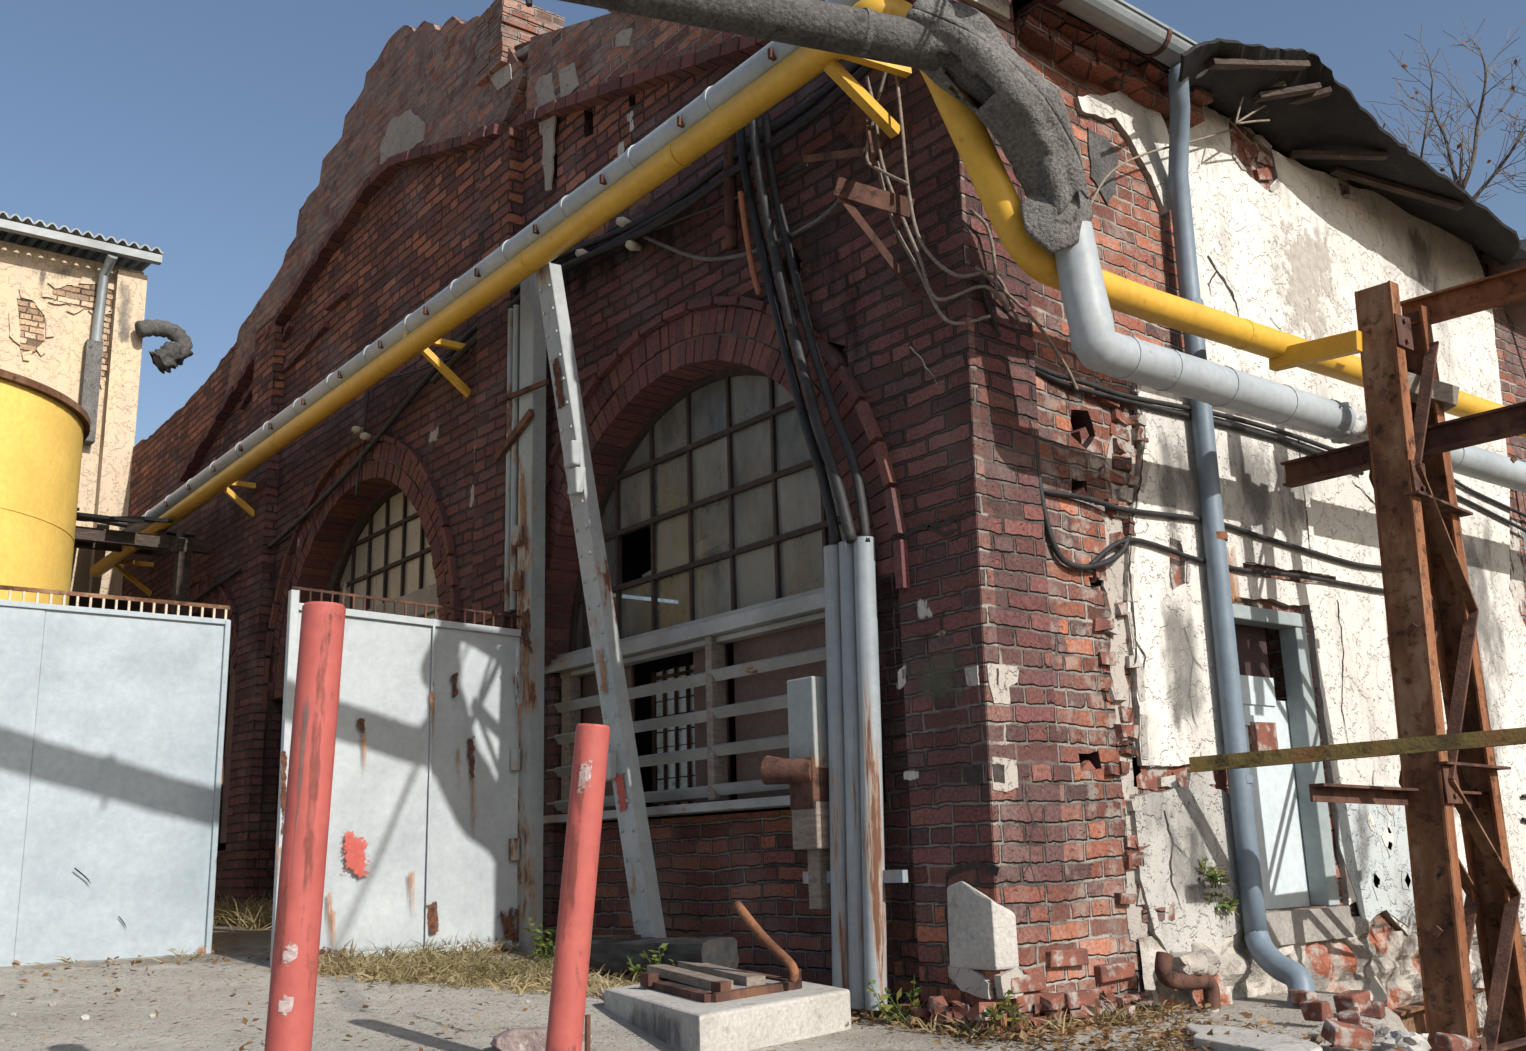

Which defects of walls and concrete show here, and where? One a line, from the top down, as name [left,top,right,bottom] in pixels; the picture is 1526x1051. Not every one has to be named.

spalling [1228,117,1280,192]
rust [430,672,458,714]
rust [513,608,533,728]
spalling [1071,383,1227,943]
rust [277,751,287,860]
rust [357,718,366,755]
rust [457,736,475,807]
rust [319,893,342,959]
rust [426,901,439,934]